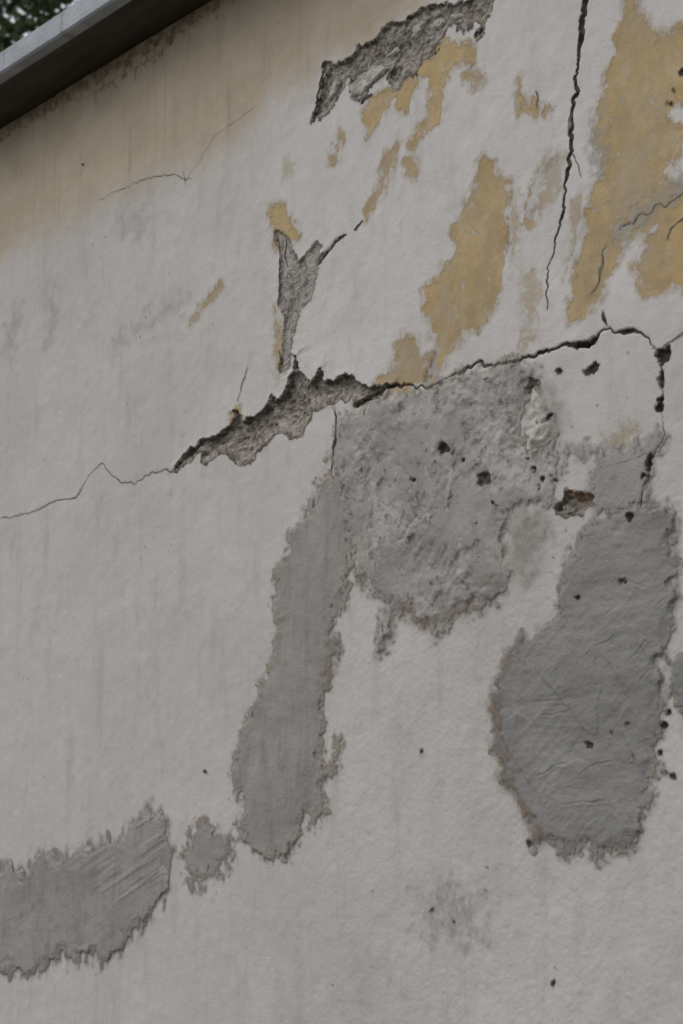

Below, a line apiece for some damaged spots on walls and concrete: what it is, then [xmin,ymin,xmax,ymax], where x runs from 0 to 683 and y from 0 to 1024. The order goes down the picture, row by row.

crack [545,0,589,310]
peeling [566,0,683,323]
peeling [174,0,513,473]
spalling [517,377,540,393]
crack [382,192,683,509]
crack [330,410,338,471]
crack [0,463,175,519]
spalling [477,471,491,487]
spalling [525,457,595,532]